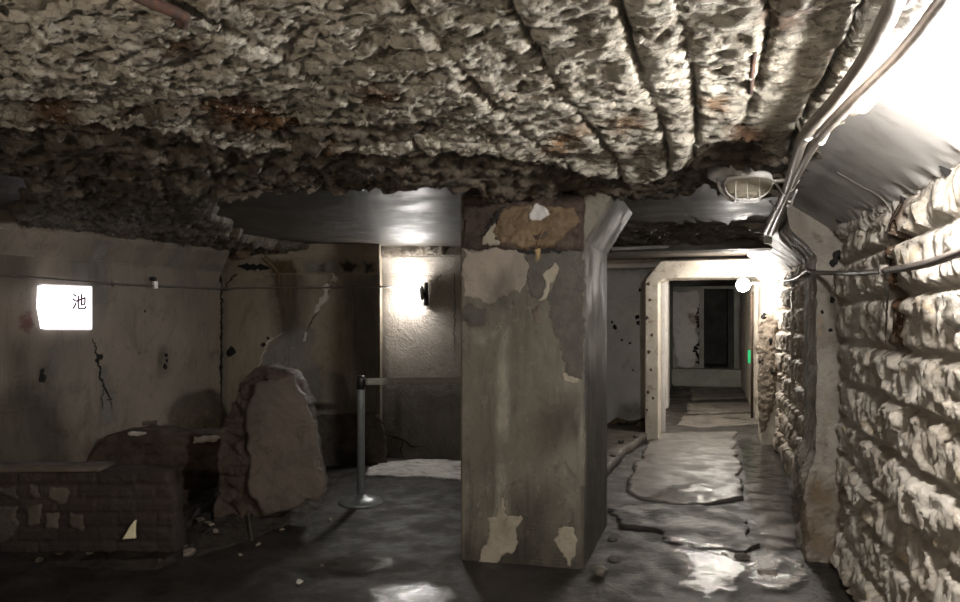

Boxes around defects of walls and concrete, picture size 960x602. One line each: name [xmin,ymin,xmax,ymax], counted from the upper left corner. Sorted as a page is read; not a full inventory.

rust [201,96,312,132]
crack [92,338,113,419]
crack [219,274,238,408]
spalling [461,191,586,566]